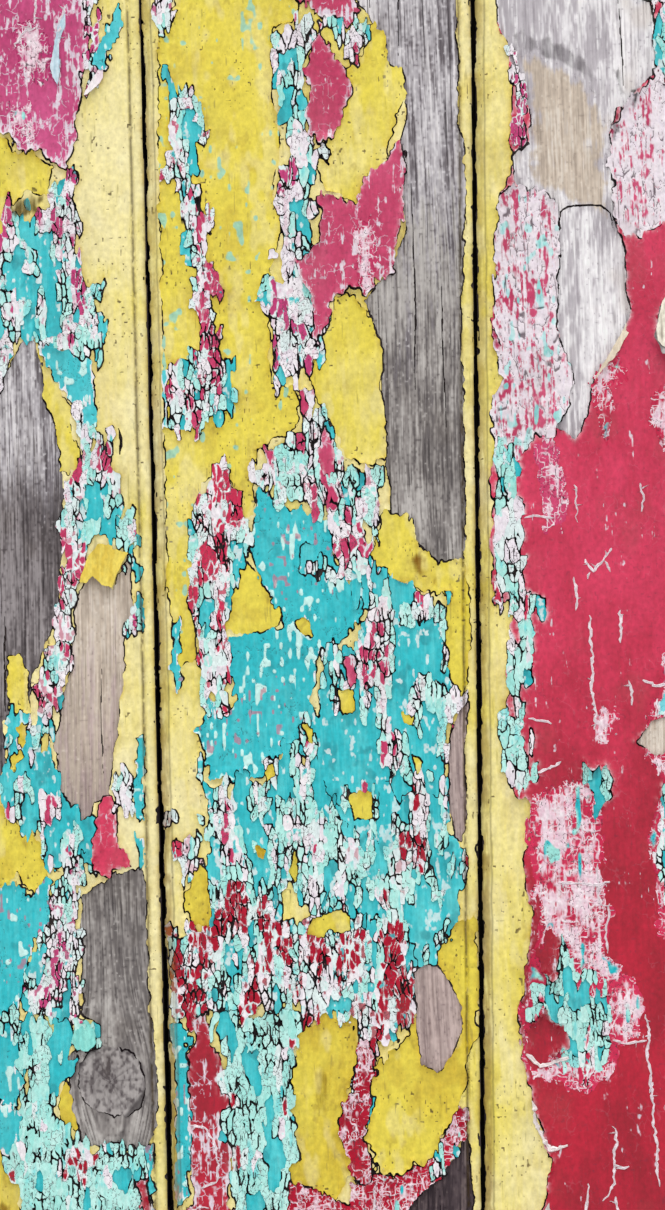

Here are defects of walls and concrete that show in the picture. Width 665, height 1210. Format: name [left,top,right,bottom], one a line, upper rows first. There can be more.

peeling [0,0,158,1210]
peeling [151,0,665,1210]
crack [528,717,552,725]
crack [524,435,582,535]
crack [573,548,665,940]
crack [588,352,665,452]
crack [639,483,648,512]
crack [517,761,660,1210]